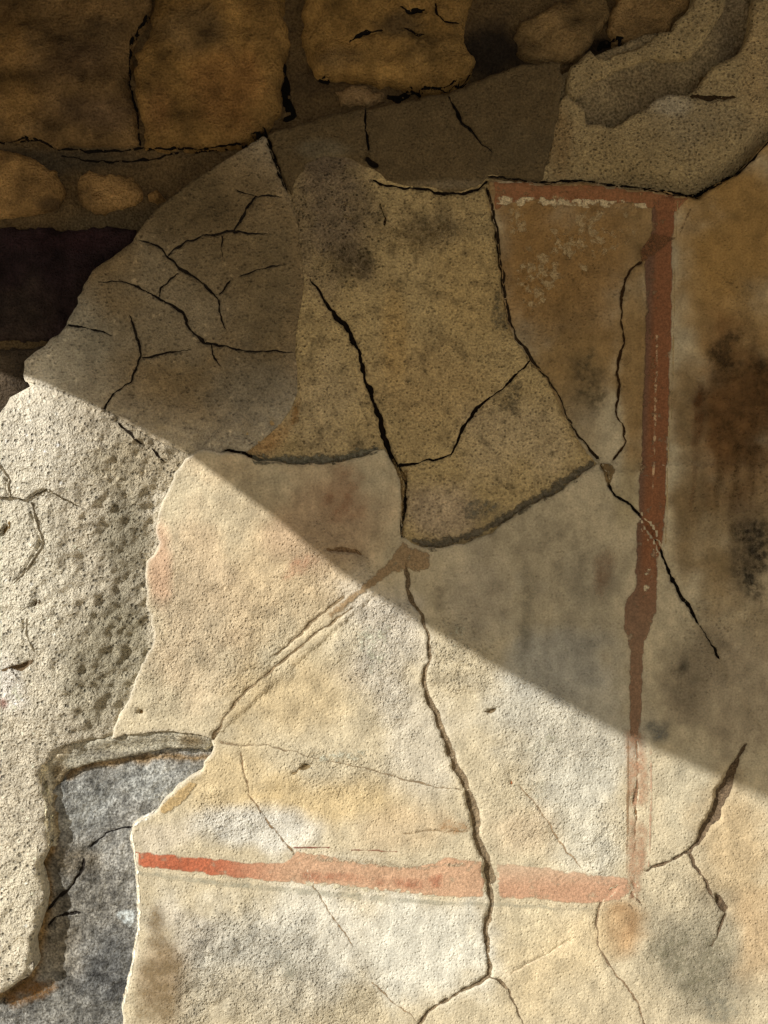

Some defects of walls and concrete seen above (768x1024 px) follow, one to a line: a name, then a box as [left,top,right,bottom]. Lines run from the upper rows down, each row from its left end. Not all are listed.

crack [0,15,291,462]
spalling [23,0,768,552]
crack [310,72,768,659]
water stain [742,523,767,596]
spalling [0,731,214,1024]
crack [211,567,523,1024]
crack [519,785,581,868]
crack [595,902,645,1024]
crack [645,743,747,947]